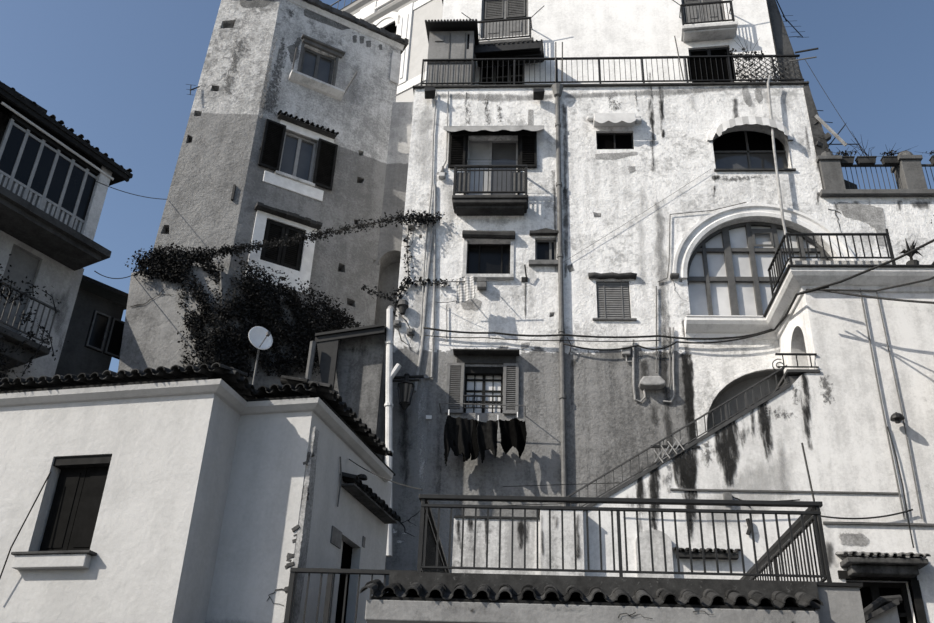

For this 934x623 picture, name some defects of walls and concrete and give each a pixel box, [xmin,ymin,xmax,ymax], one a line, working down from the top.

damp [631,205,697,537]
damp [708,396,772,486]
damp [801,373,812,449]